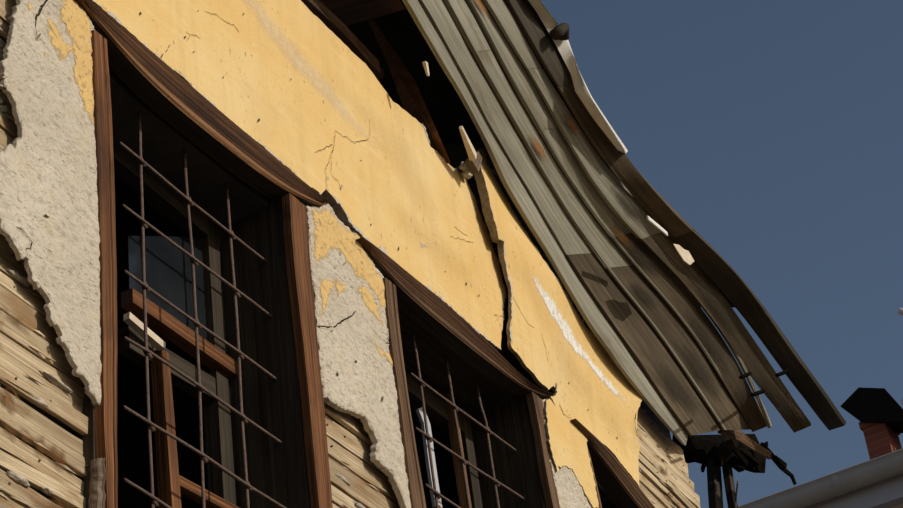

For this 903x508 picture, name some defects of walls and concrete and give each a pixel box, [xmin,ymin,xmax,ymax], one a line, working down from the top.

spalling [0,0,102,407]
crack [314,119,371,190]
crack [445,150,456,169]
spalling [306,176,411,508]
crack [494,296,548,359]
spalling [542,382,599,508]